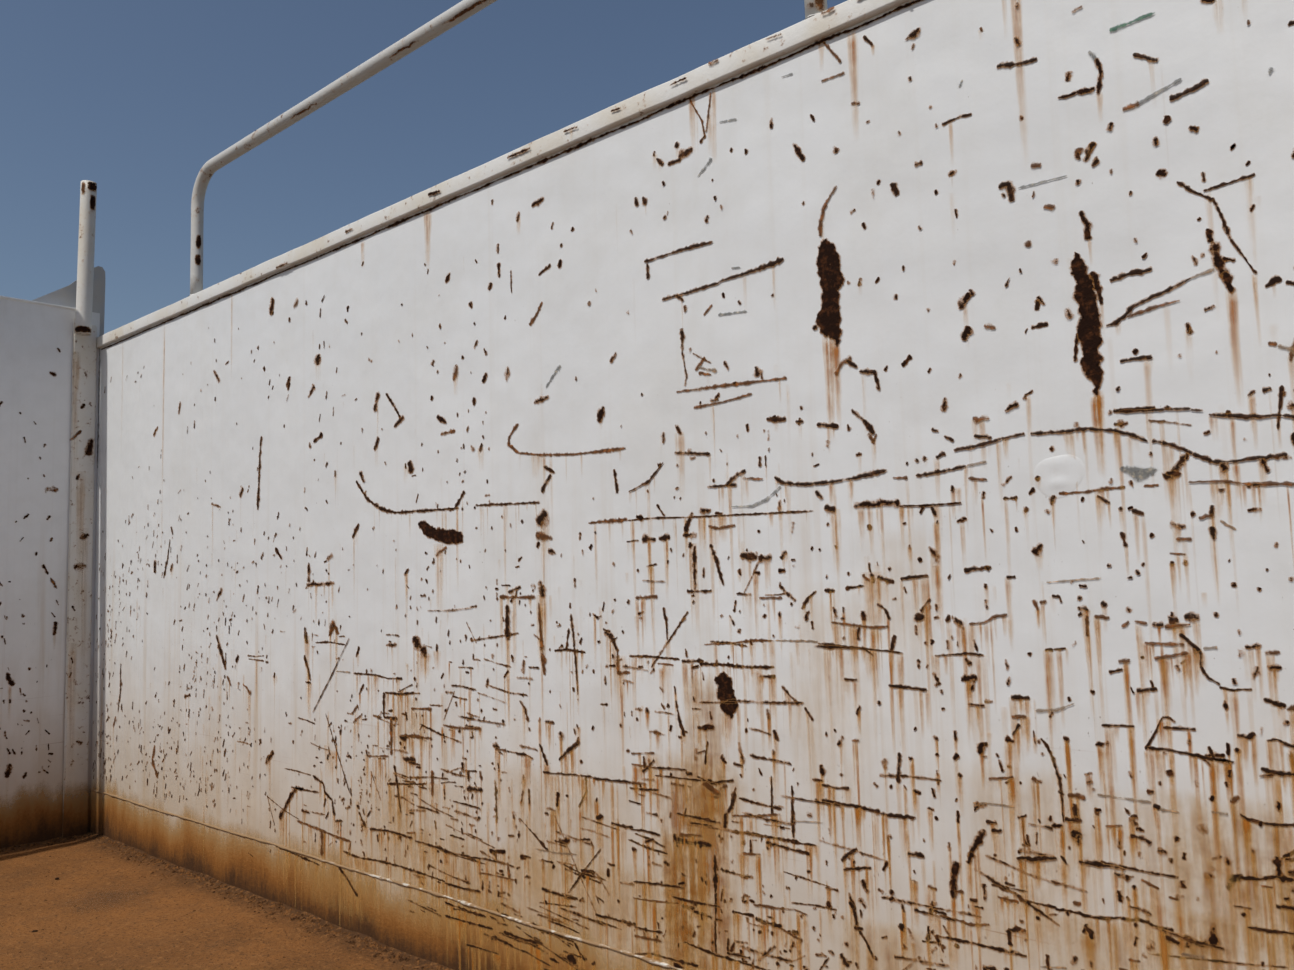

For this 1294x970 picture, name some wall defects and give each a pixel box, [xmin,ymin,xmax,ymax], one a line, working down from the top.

rust [1074,142,1100,167]
rust [998,181,1015,202]
rust [80,0,922,468]
rust [1074,399,1128,434]
rust [906,428,954,465]
rust [1162,453,1189,480]
rust [1170,505,1217,541]
rust [1032,580,1219,707]
rust [0,467,1166,970]
rust [1157,835,1187,864]
rust [1071,875,1232,970]